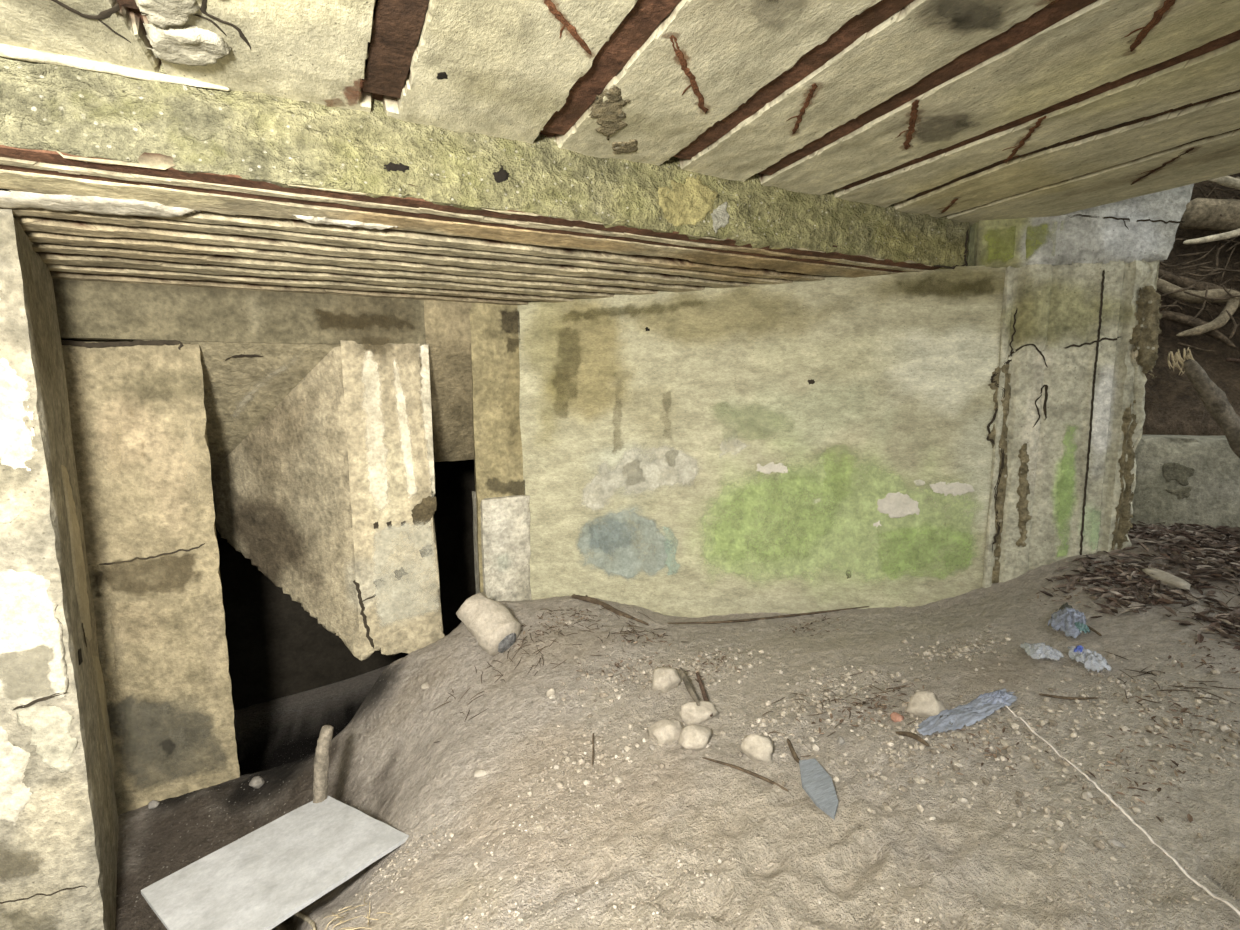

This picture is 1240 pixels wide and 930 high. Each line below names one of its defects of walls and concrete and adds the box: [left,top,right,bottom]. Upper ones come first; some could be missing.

peeling [135,0,251,66]
flaking render [0,190,201,218]
flaking render [292,214,398,230]
flaking render [0,358,37,471]
crack [1009,270,1120,555]
water stain [578,447,698,579]
water stain [715,477,836,561]
water stain [61,465,226,788]
crack [353,580,377,649]
flaking render [0,569,78,825]
crack [0,885,86,904]